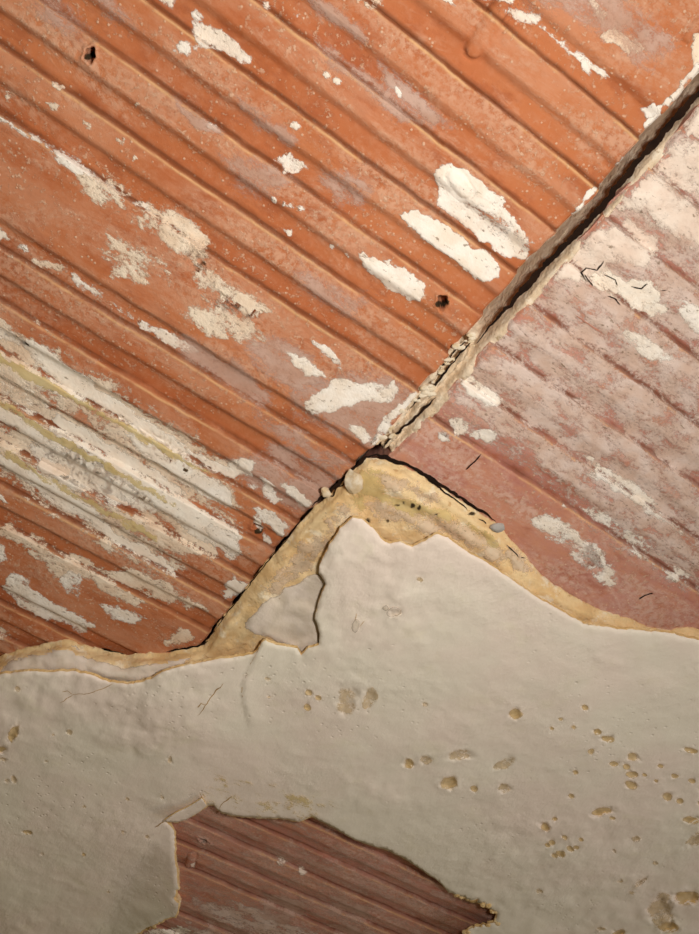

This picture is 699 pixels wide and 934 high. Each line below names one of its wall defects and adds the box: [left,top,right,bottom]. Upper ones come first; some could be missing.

peeling [505,8,541,24]
peeling [273,152,307,174]
peeling [71,273,103,297]
peeling [114,303,197,353]
crack [167,90,699,652]
peeling [237,457,314,544]
flaking render [365,472,533,573]
flaking render [245,503,350,652]
flaking render [1,646,188,682]
flaking render [541,817,583,858]
peeling [137,797,214,934]
flaking render [649,892,699,932]